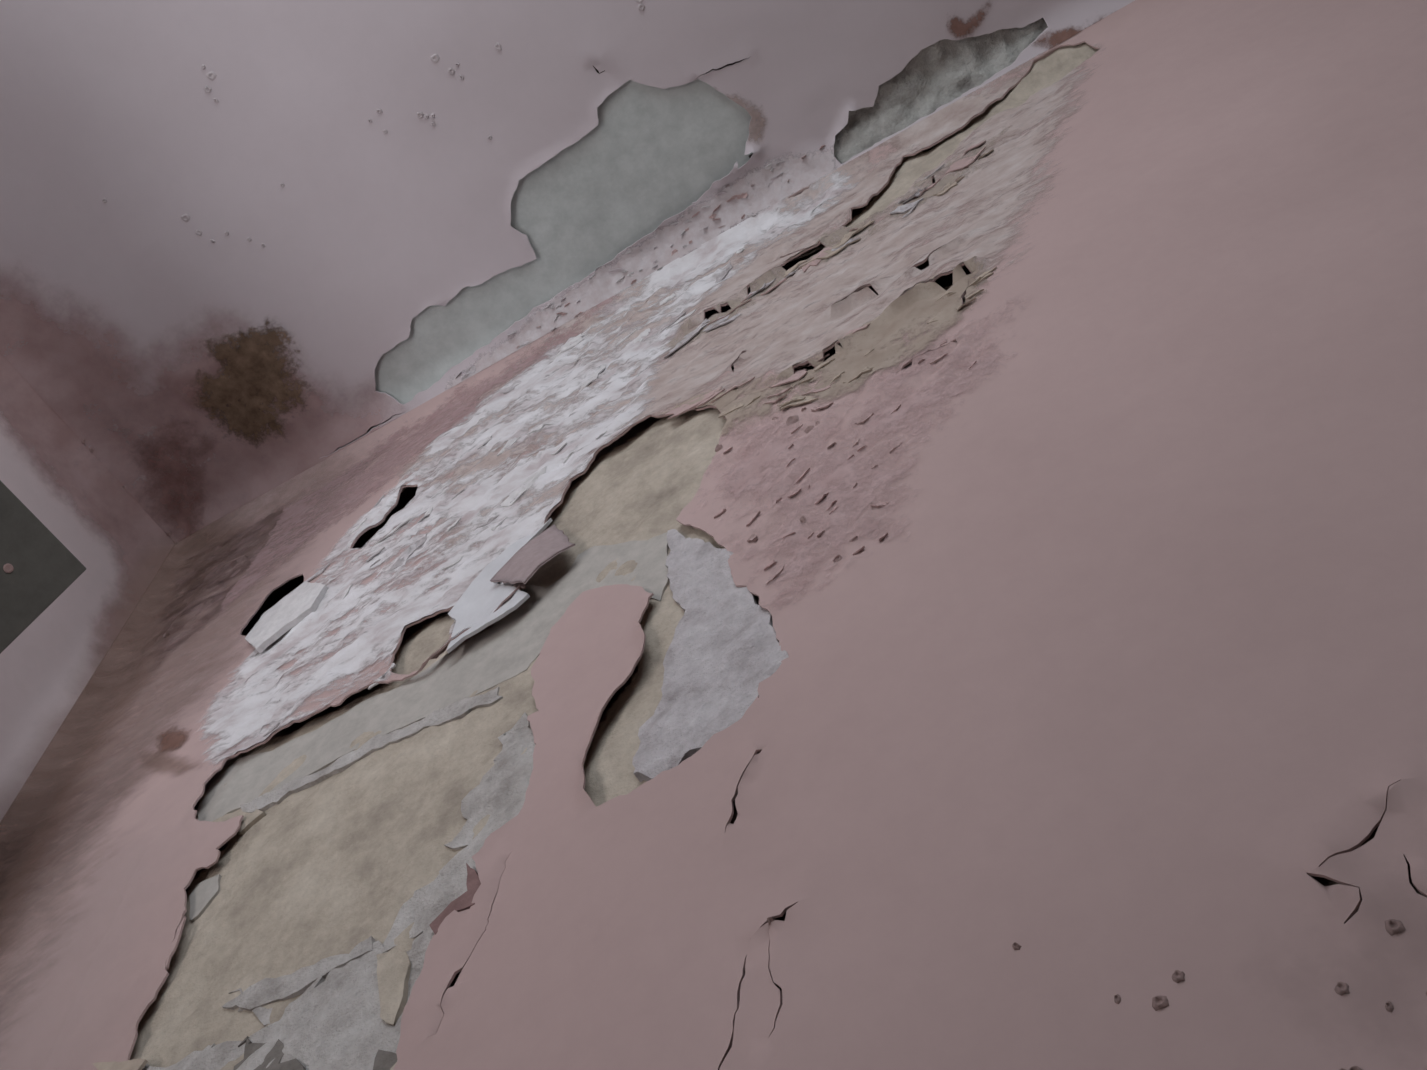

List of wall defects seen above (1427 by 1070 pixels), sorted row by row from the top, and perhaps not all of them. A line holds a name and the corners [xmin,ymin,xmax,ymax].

water stain [0,172,858,920]
flaking render [92,18,1099,1070]
crack [730,791,738,824]